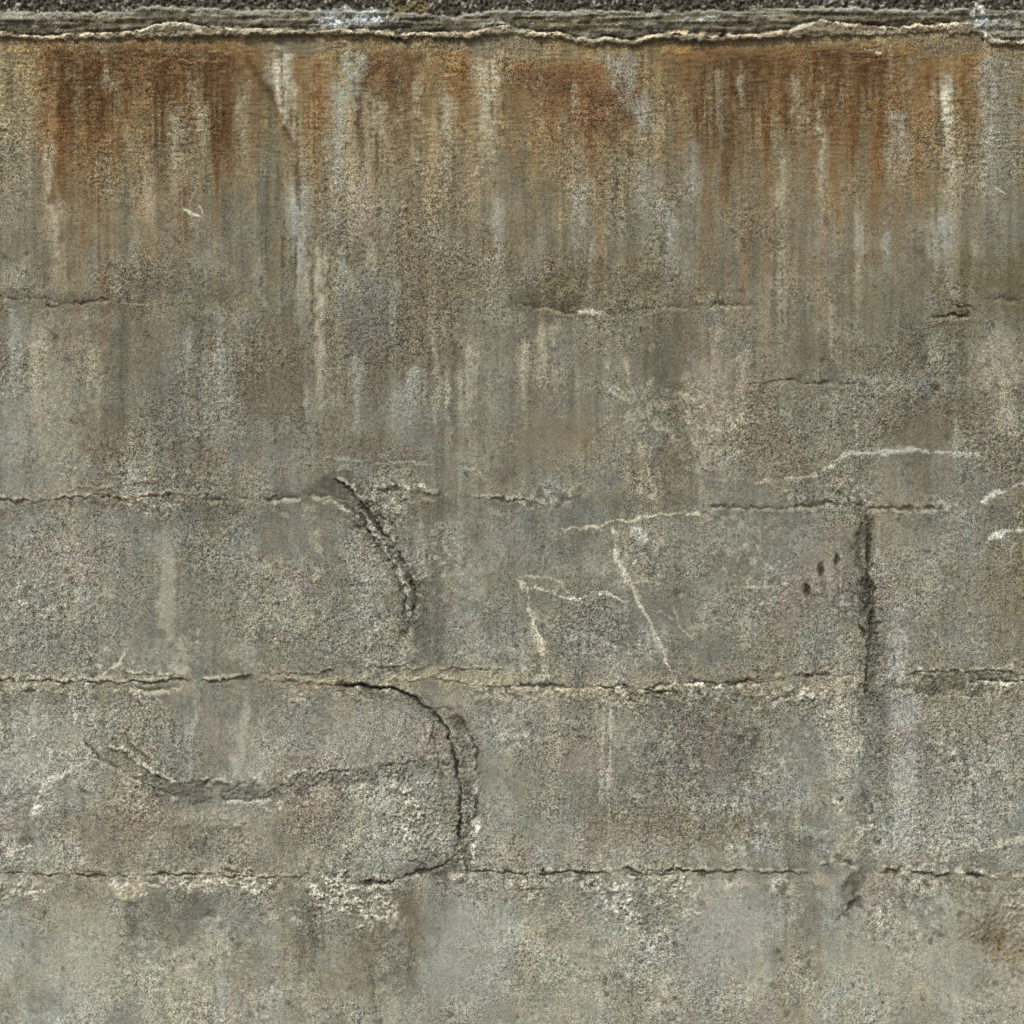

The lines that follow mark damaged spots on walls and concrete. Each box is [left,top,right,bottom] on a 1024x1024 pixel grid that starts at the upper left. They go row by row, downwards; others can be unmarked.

rust [25,39,339,292]
leakage [4,45,768,668]
rust [353,45,483,266]
rust [483,41,984,400]
leakage [764,143,797,345]
leakage [784,71,833,193]
crack [0,368,1024,925]